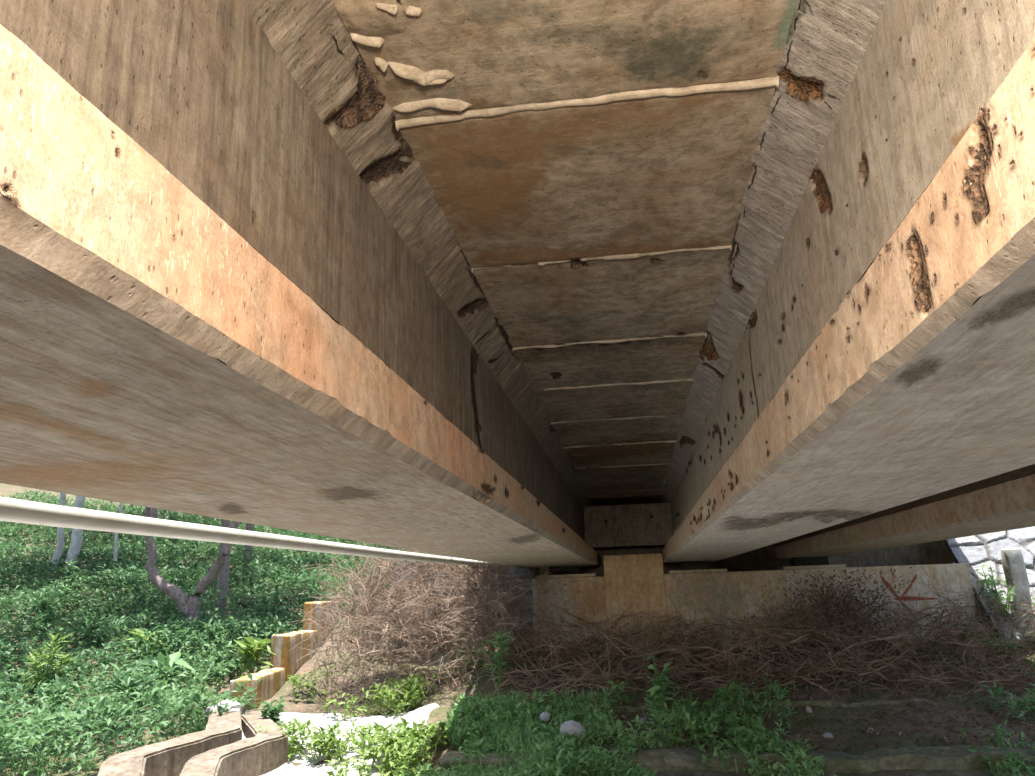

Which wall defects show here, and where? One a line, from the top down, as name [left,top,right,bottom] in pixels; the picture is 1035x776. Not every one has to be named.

crack [784,0,813,69]
spalling [778,68,836,109]
spalling [324,54,413,184]
crack [743,96,781,218]
spalling [809,169,832,214]
spalling [859,152,869,186]
spalling [458,267,519,360]
spalling [531,332,685,355]
spalling [698,331,725,382]